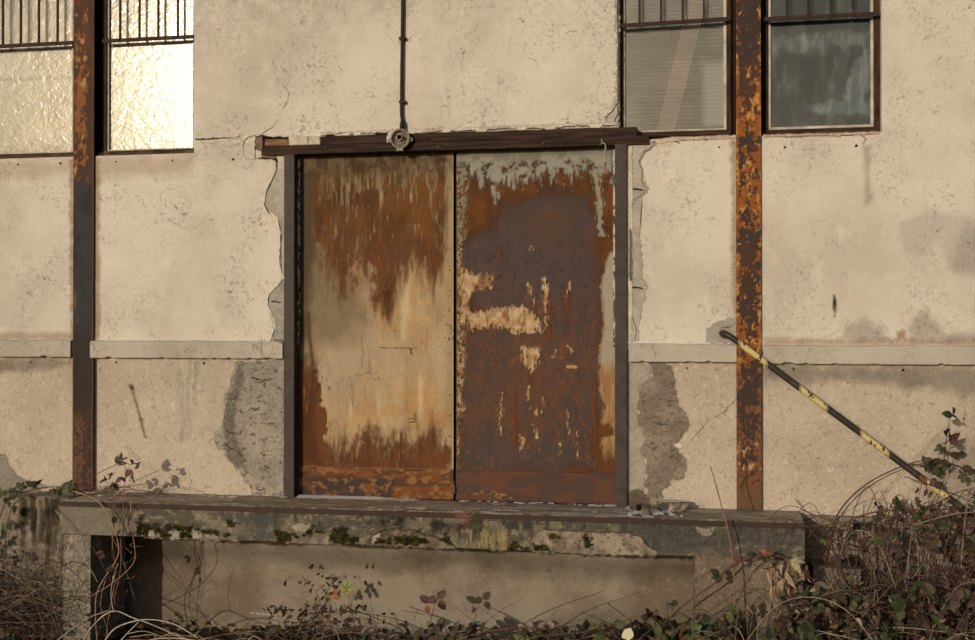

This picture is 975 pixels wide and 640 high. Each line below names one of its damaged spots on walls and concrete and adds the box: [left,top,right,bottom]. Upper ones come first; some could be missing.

crack [195,84,289,159]
flaking render [255,129,396,340]
rust [312,163,613,319]
peeling [445,147,615,467]
flaking render [627,143,658,342]
flaking render [0,454,49,491]
leakage [18,495,63,575]
flaking render [214,359,284,496]
rust [299,311,451,469]
rust [567,383,615,473]
flaking render [627,362,690,507]